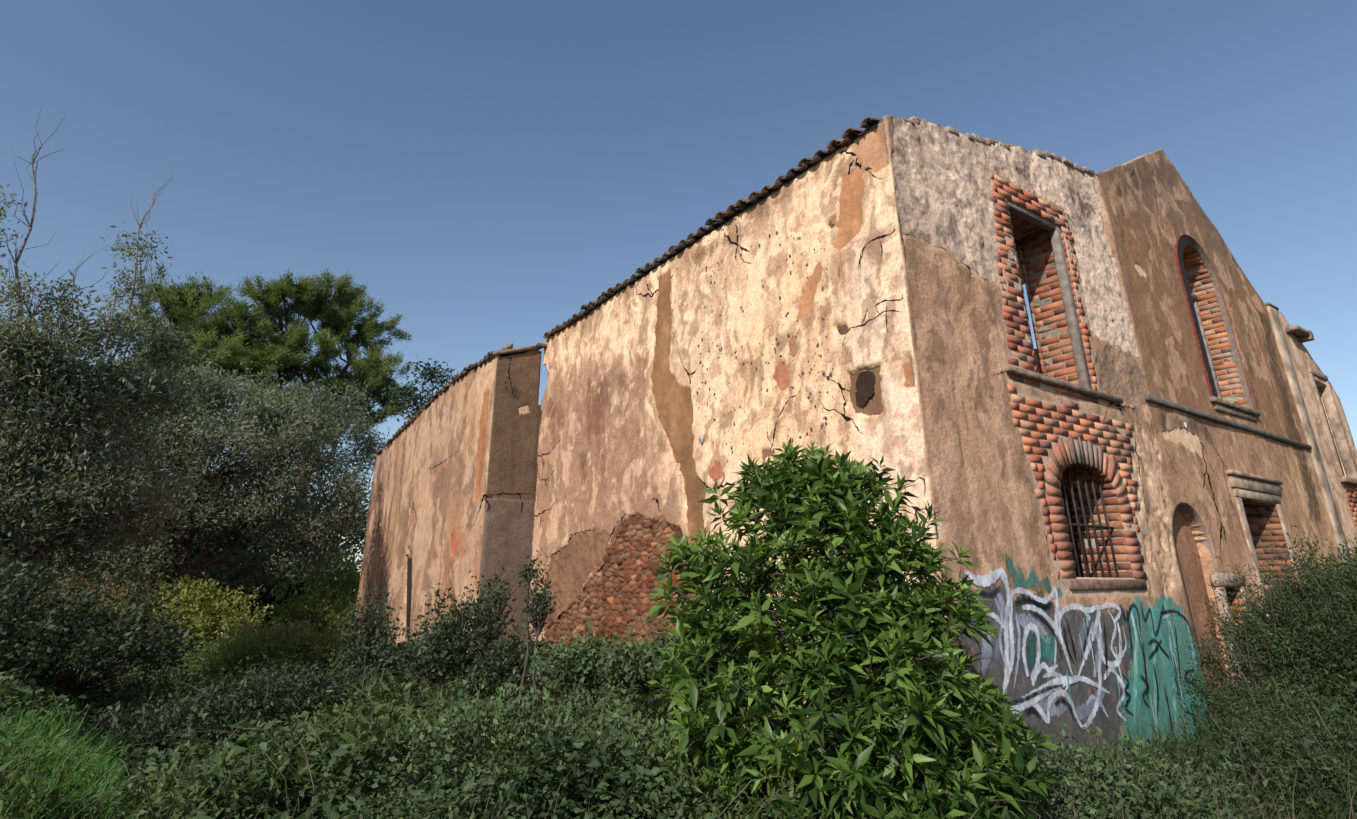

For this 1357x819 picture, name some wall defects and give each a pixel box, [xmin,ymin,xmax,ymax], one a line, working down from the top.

crack [722,225,749,263]
crack [858,229,977,275]
peeling [773,117,1150,408]
flaking render [544,269,722,653]
crack [678,295,903,516]
spalling [849,366,883,416]